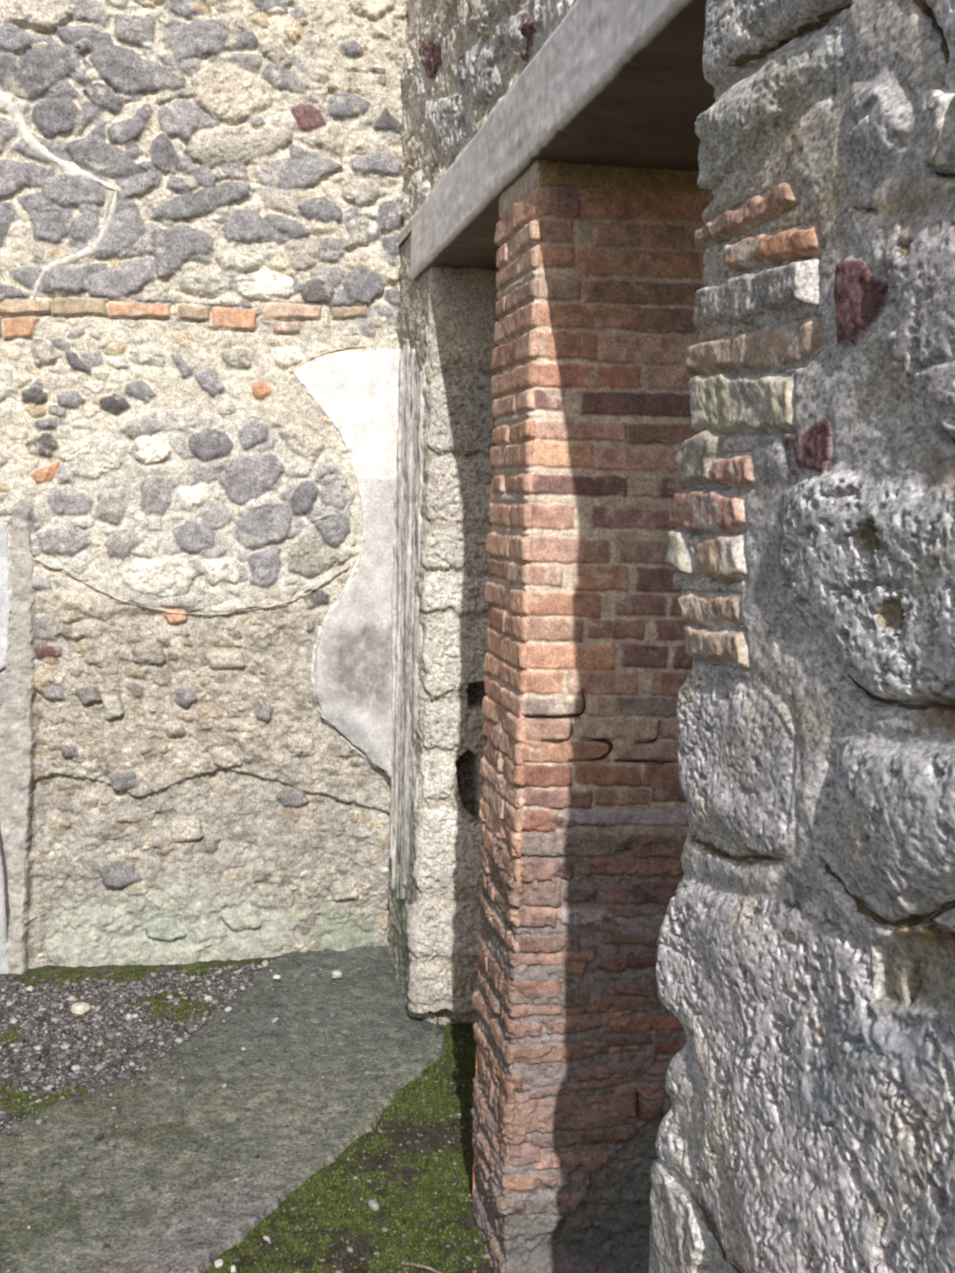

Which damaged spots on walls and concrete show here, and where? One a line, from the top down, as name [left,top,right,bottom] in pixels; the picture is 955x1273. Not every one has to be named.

crack [0,91,117,299]
flaking render [0,522,12,673]
spalling [27,324,428,969]
spalling [467,682,486,705]
spalling [456,750,474,814]
crack [0,829,10,943]
flaking render [0,849,10,974]
spalling [527,1107,662,1263]